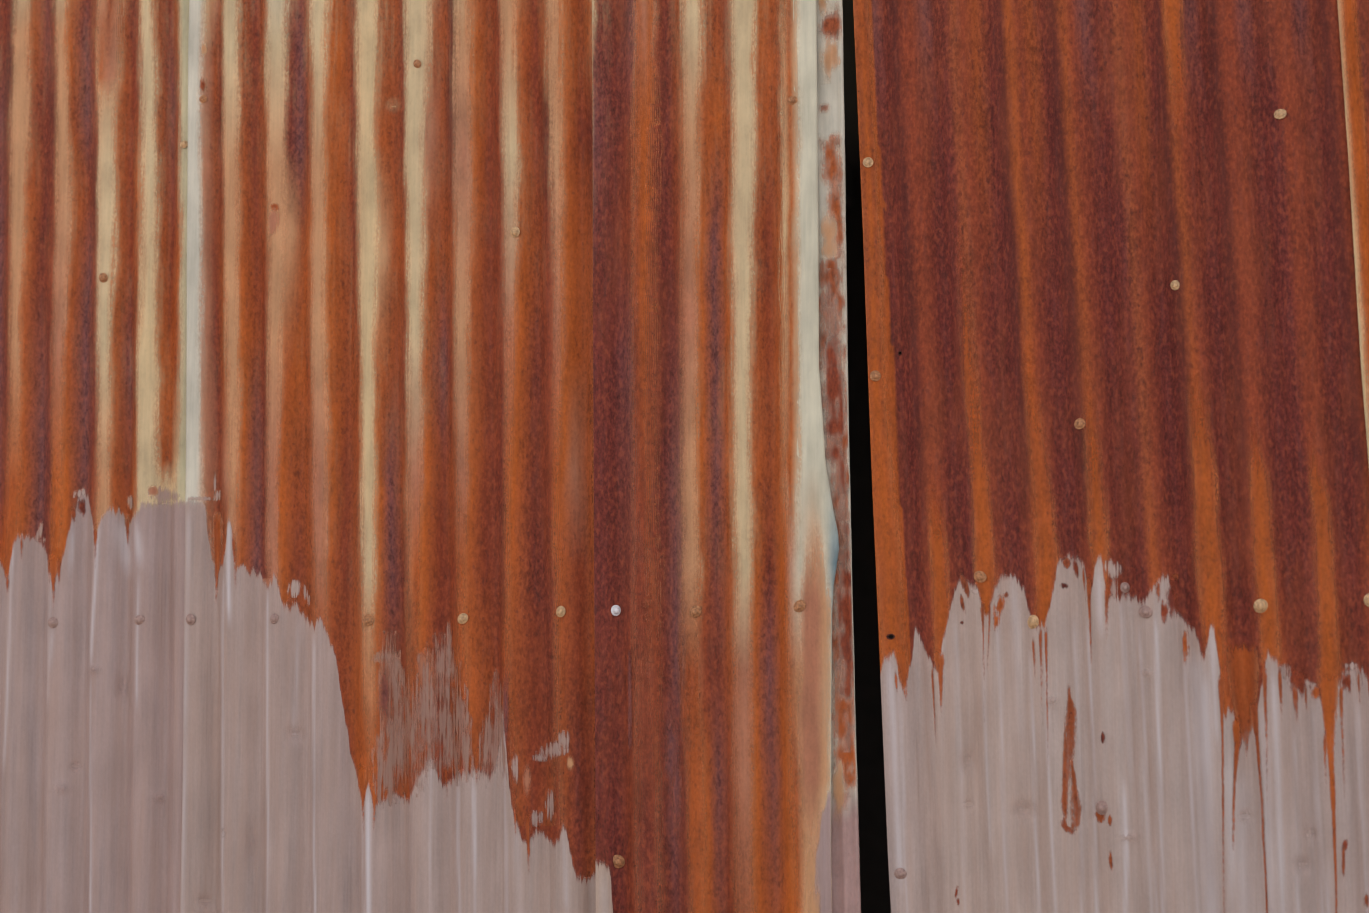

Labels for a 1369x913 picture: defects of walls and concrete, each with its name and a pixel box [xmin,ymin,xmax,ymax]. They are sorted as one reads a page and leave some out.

rust [0,0,183,598]
peeling [288,580,310,608]
peeling [371,622,573,806]
rust [200,0,857,913]
peeling [532,792,554,827]
rust [819,0,908,697]
rust [1026,372,1112,834]
peeling [1061,557,1078,589]
peeling [1105,559,1121,598]
peeling [1156,574,1179,623]
rust [1190,388,1369,913]
rust [1344,0,1369,406]